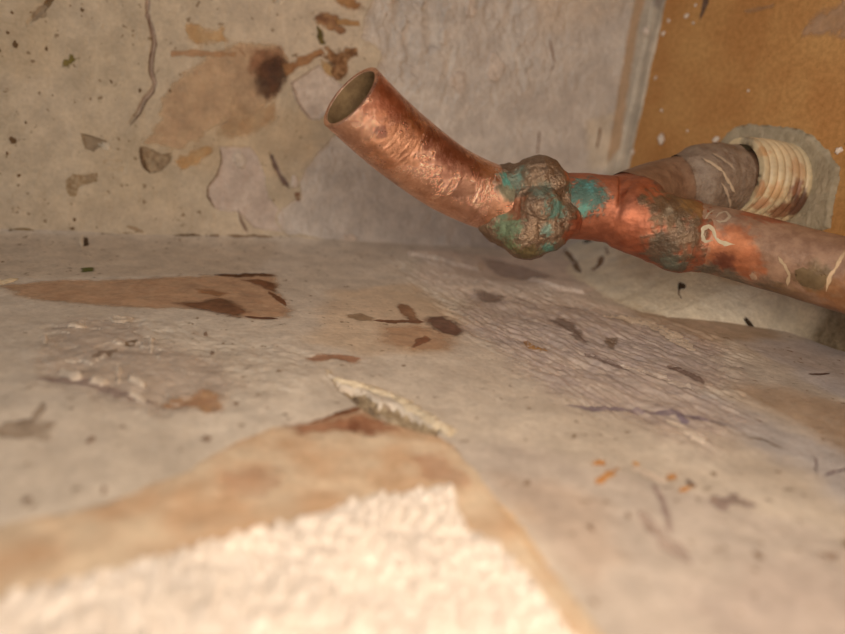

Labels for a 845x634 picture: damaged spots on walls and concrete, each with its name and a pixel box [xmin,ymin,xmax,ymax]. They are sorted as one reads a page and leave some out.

crack [130,0,157,124]
flaking render [361,0,634,175]
flaking render [278,135,499,247]
flaking render [309,369,458,437]